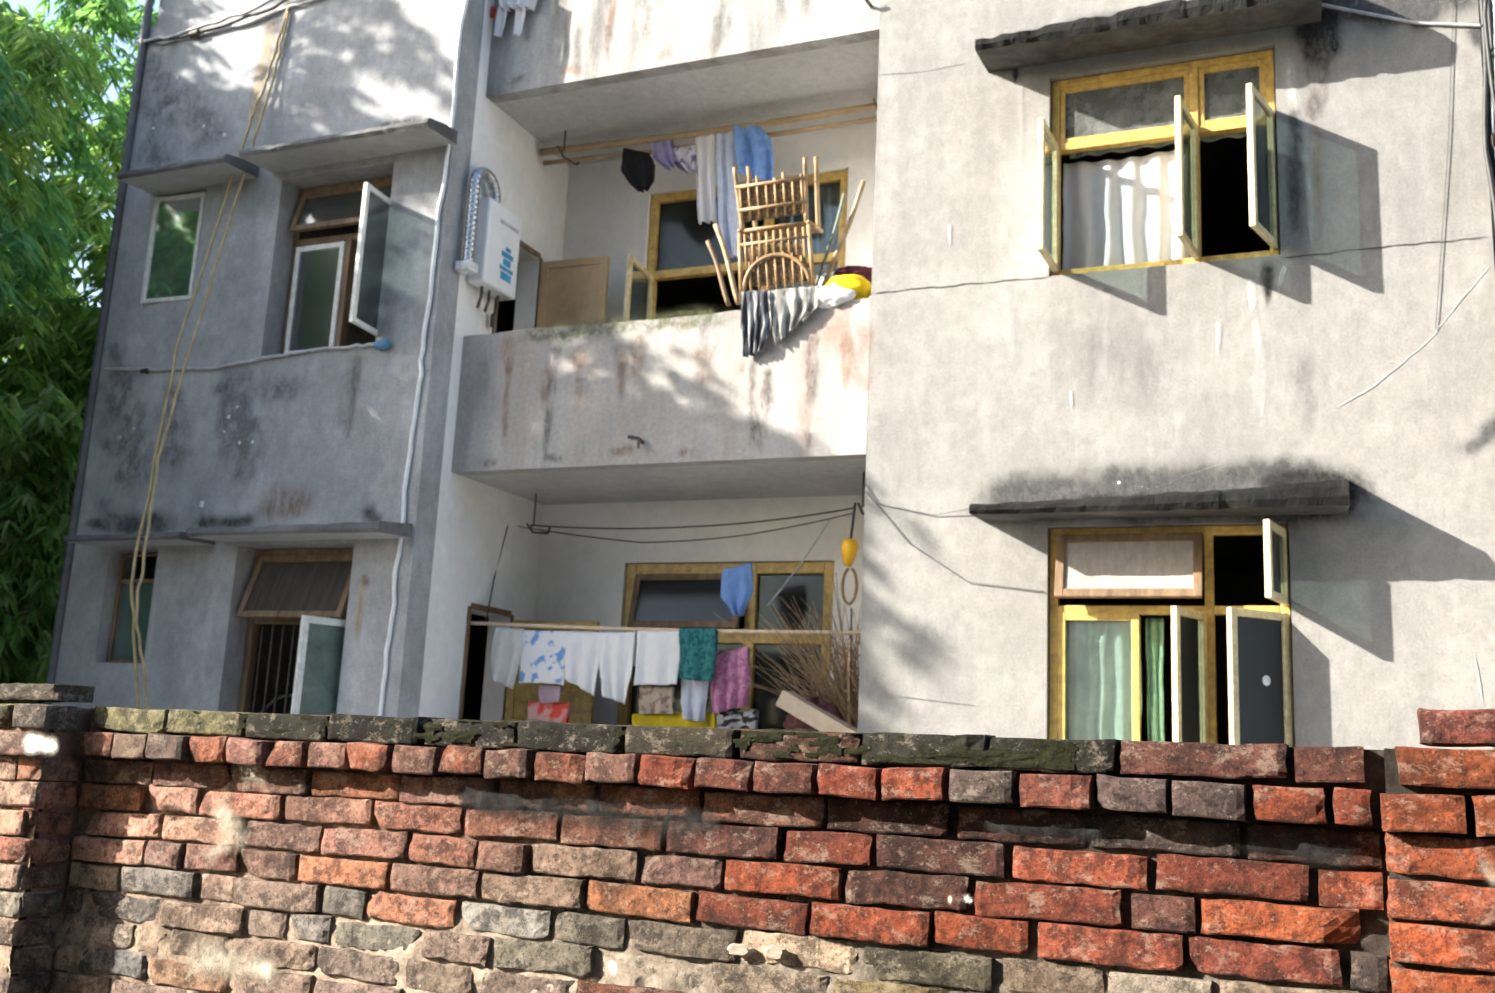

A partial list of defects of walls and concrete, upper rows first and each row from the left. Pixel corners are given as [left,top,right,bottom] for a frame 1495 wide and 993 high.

damp [1469,28,1482,44]
damp [1285,0,1471,222]
damp [1249,266,1286,298]
damp [104,346,142,482]
damp [216,374,259,478]
damp [750,363,770,404]
damp [199,517,250,528]
damp [990,459,1363,526]